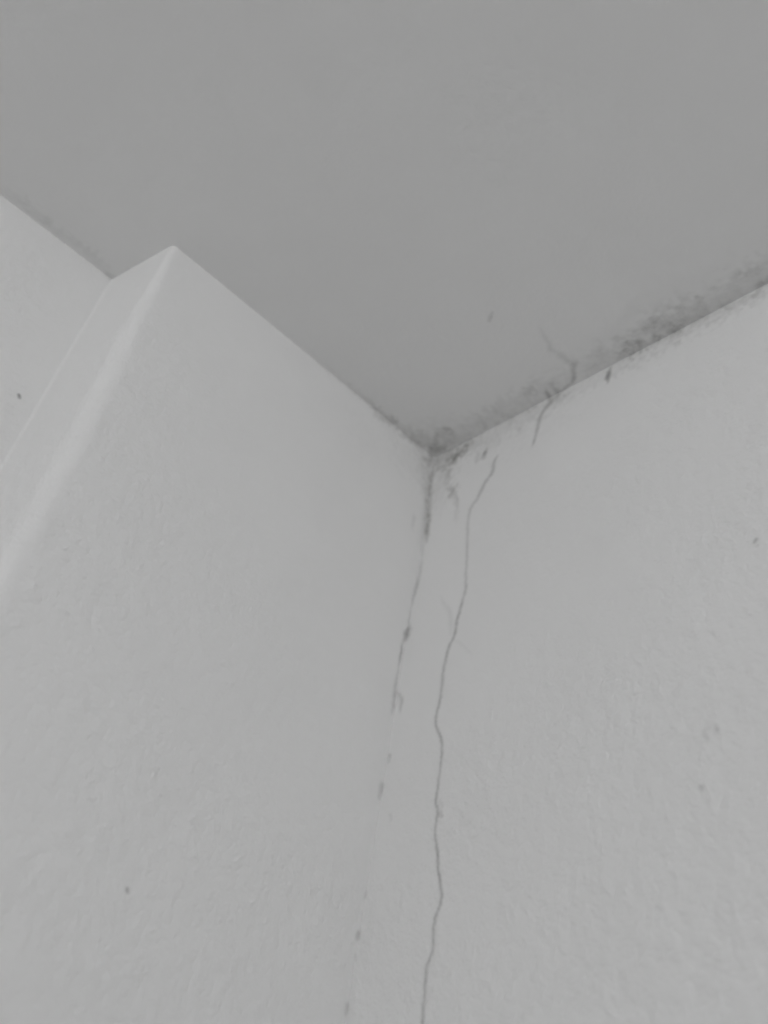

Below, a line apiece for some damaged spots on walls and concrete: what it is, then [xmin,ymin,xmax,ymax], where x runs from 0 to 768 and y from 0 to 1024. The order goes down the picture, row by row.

leakage [318,237,768,527]
crack [389,453,501,1024]